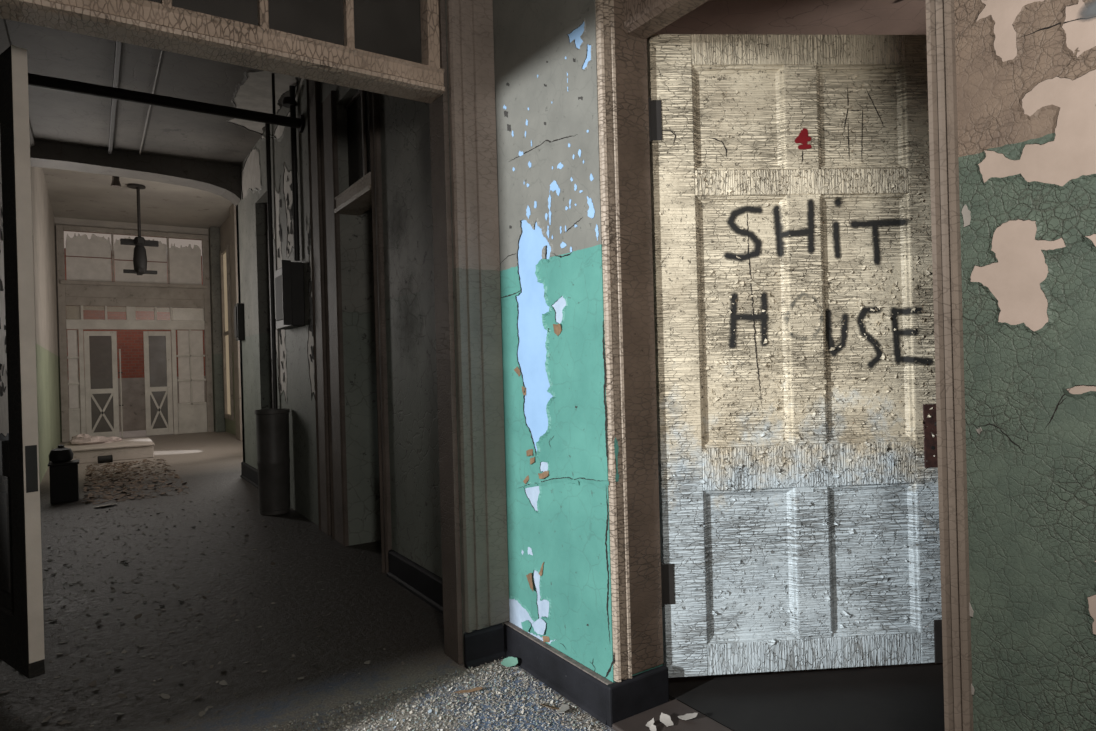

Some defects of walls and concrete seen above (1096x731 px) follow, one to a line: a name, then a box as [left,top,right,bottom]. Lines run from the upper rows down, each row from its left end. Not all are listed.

peeling [503,105,532,171]
crack [509,134,578,166]
peeling [565,19,593,100]
peeling [971,0,1096,191]
peeling [961,204,971,227]
peeling [0,144,9,436]
peeling [509,143,599,514]
peeling [967,215,1096,336]
crack [517,330,614,677]
peeling [509,547,555,644]
peeling [1083,582,1096,637]
peeling [501,657,518,667]